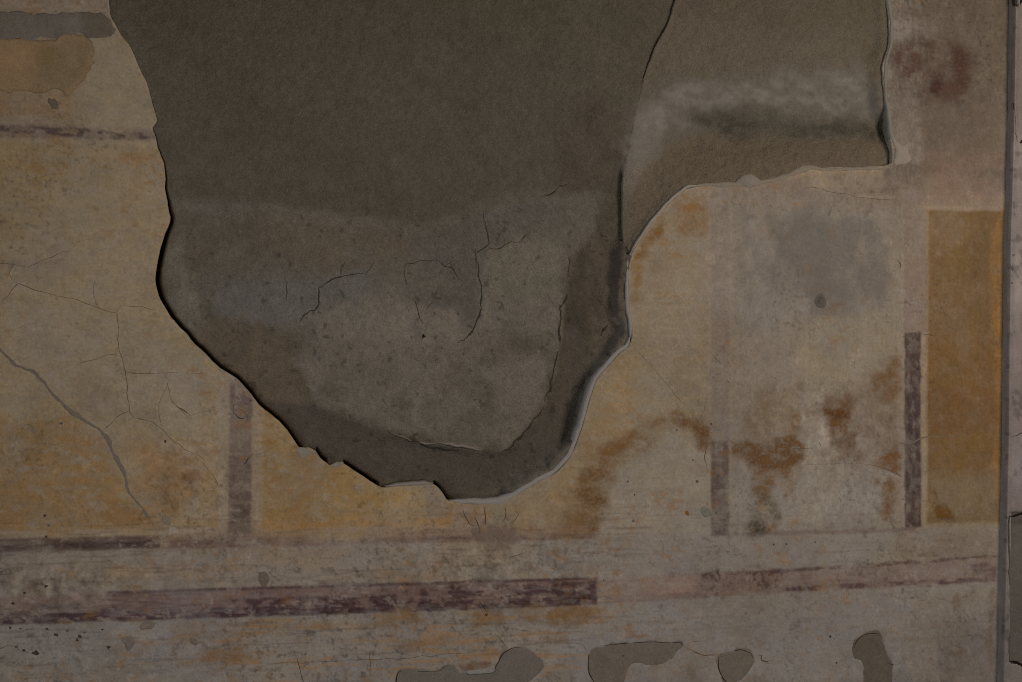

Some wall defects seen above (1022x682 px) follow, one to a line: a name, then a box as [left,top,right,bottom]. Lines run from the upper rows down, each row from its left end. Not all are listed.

crack [300,264,373,321]
crack [403,211,530,343]
flaking render [109,0,912,546]
crack [0,238,248,524]
flaking render [1006,512,1022,667]